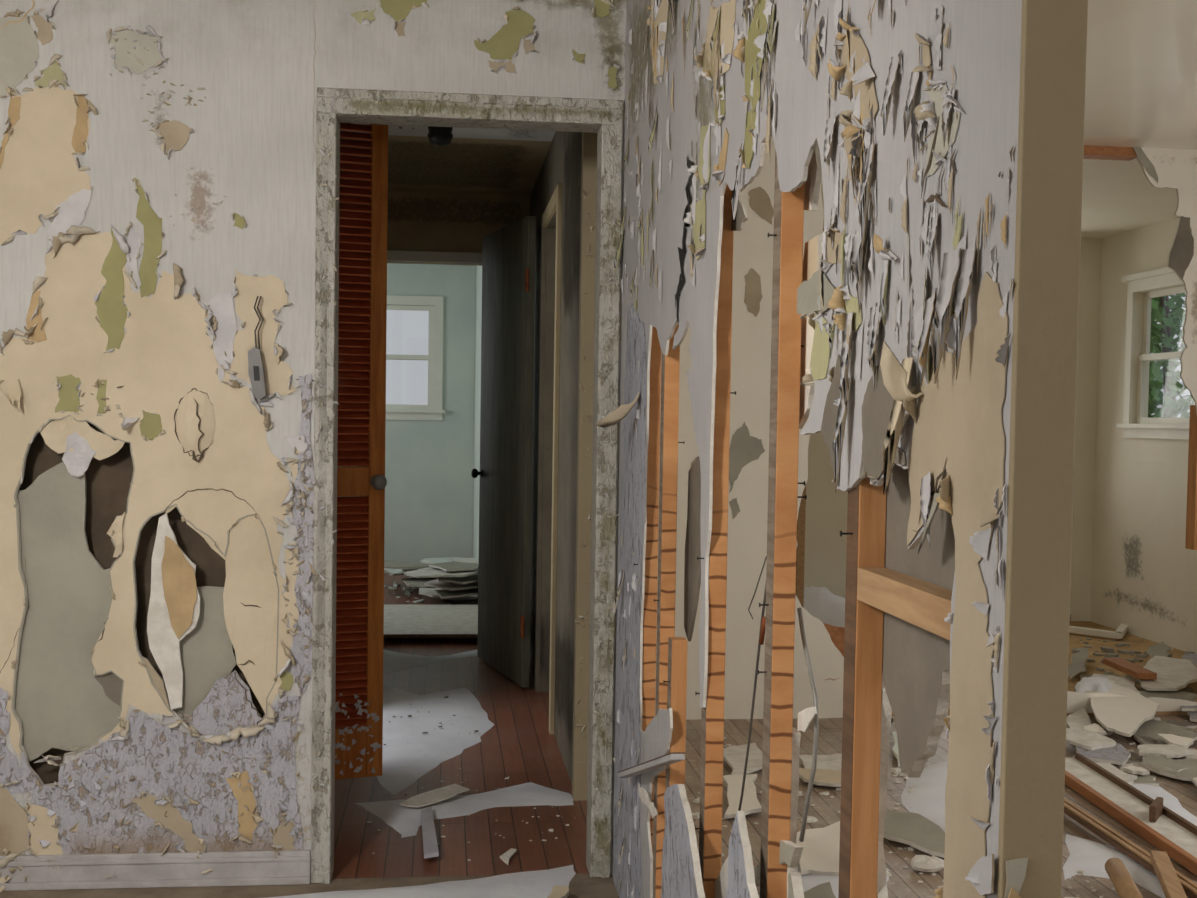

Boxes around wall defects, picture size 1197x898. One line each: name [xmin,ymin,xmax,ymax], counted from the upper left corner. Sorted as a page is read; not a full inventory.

peeling [0,8,381,882]
peeling [347,0,429,37]
peeling [468,0,777,898]
peeling [794,0,1012,898]